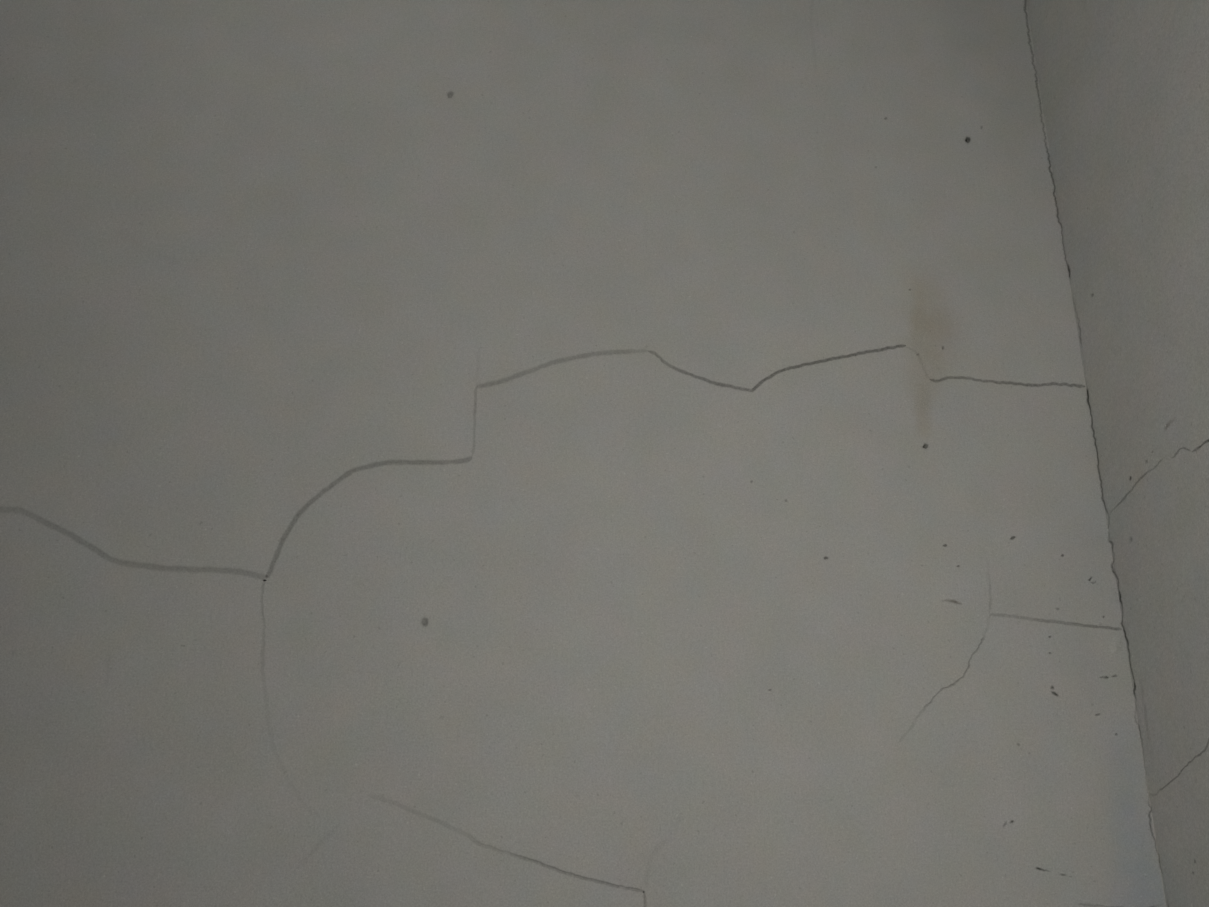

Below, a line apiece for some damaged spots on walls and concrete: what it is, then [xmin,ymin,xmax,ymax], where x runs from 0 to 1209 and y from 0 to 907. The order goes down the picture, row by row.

crack [930,375,1090,407]
crack [1191,439,1209,453]
crack [0,343,906,817]
crack [898,596,1126,743]
crack [1150,738,1209,797]
crack [368,793,647,907]